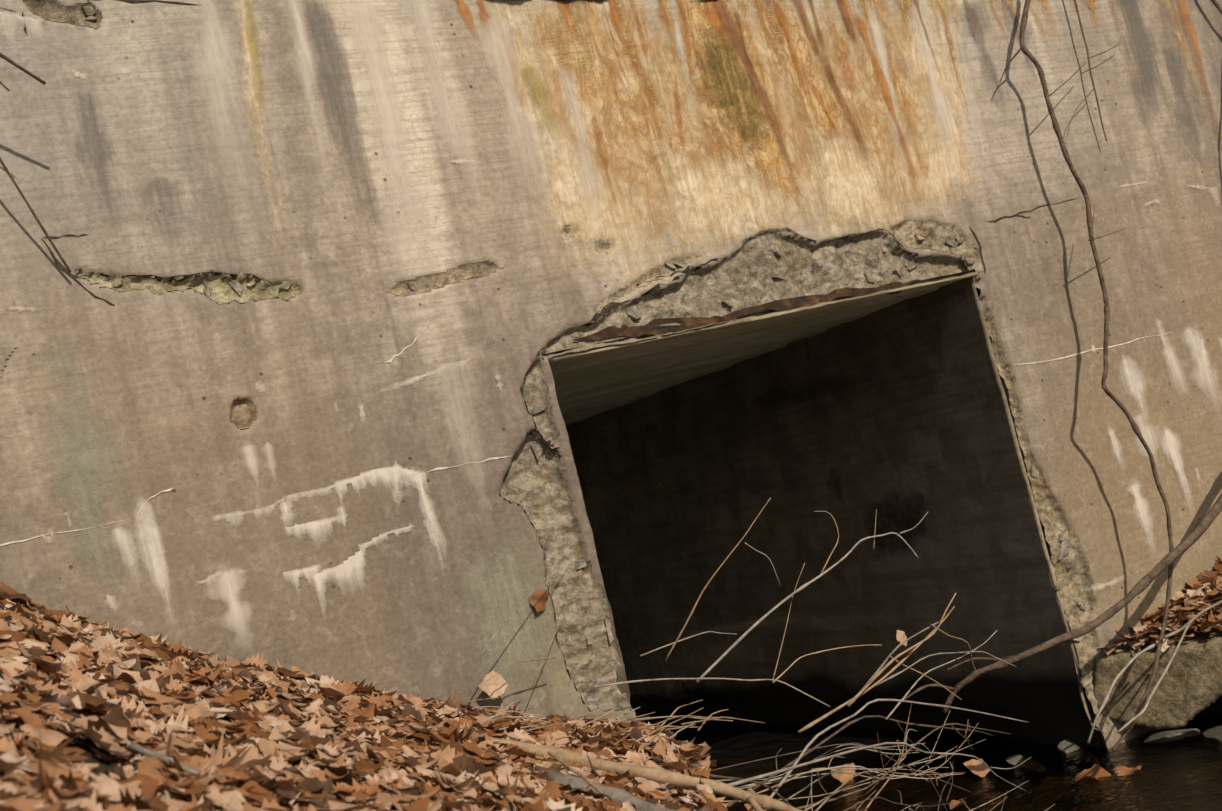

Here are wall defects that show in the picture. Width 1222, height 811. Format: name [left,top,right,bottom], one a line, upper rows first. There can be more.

spalling [24,0,103,29]
rust [456,0,493,31]
rust [499,0,683,146]
rust [660,0,909,206]
rust [899,0,963,90]
spalling [75,268,304,304]
spalling [386,260,504,296]
leakage [1123,359,1186,486]
leakage [283,503,345,533]
leakage [319,466,438,535]
spalling [500,219,1109,734]
leakage [283,526,410,595]